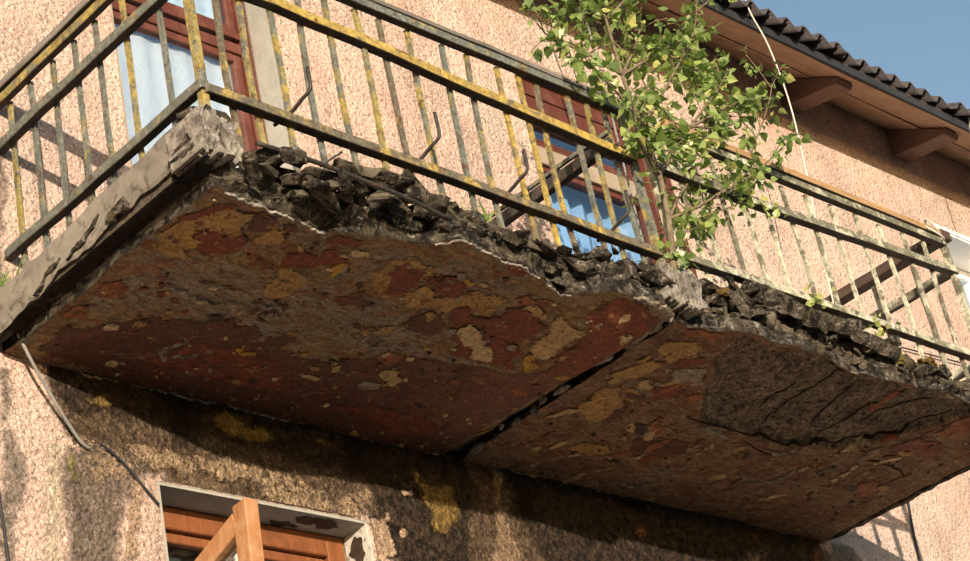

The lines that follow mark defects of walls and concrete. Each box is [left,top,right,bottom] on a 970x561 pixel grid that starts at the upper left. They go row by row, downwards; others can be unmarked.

peeling [32,103,677,454]
peeling [81,435,408,561]
water stain [42,365,862,561]
spalling [520,277,970,522]
crack [691,369,951,475]